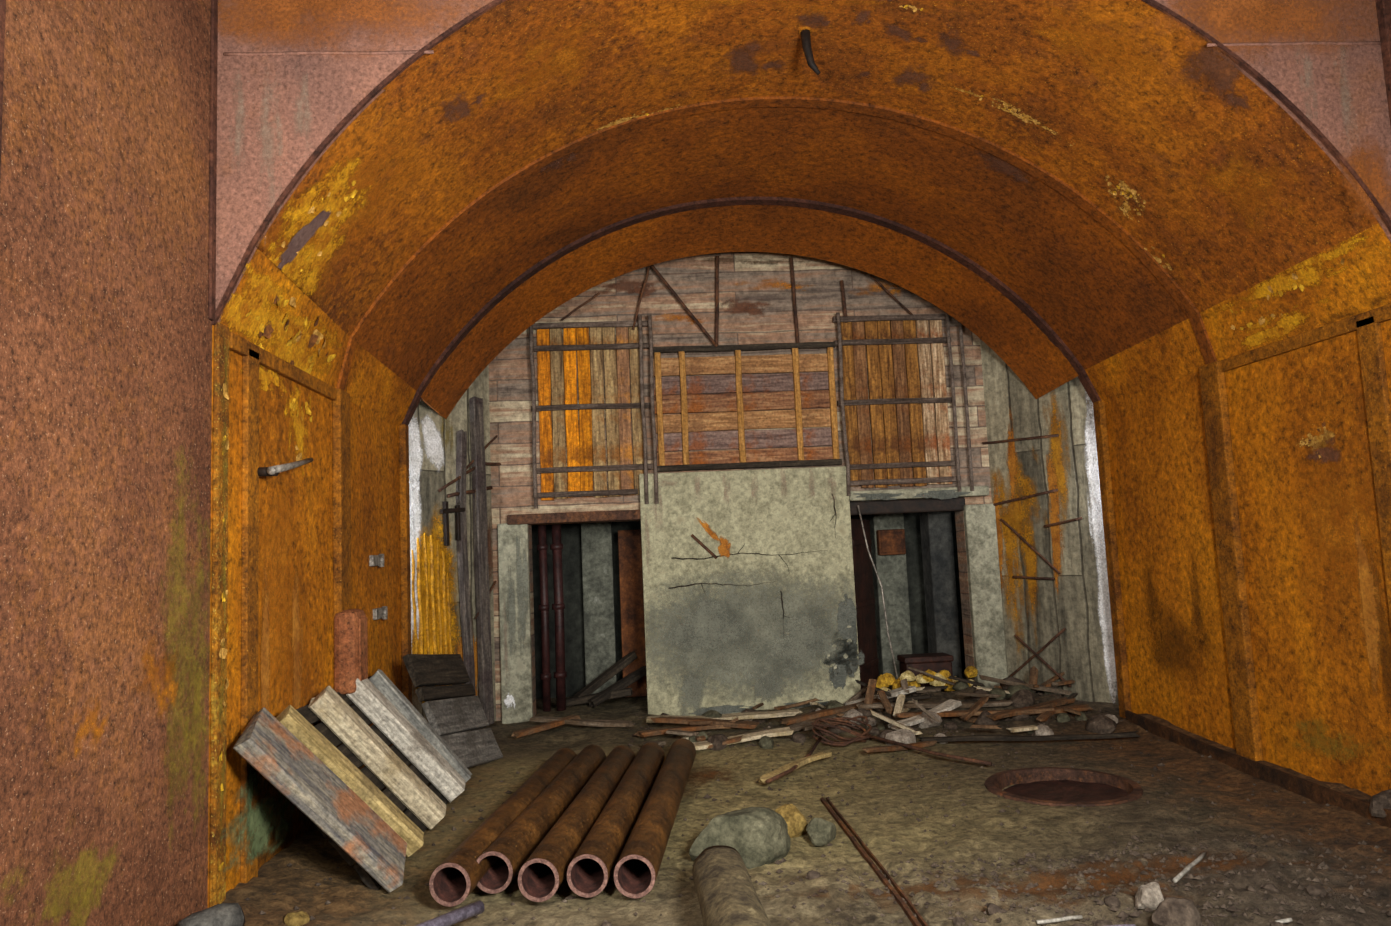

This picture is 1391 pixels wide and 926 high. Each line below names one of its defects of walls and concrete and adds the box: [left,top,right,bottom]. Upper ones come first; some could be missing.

rust [1187,0,1351,42]
peeling [221,158,378,475]
peeling [219,624,229,659]
rust [992,397,1068,641]
rust [1313,486,1380,691]